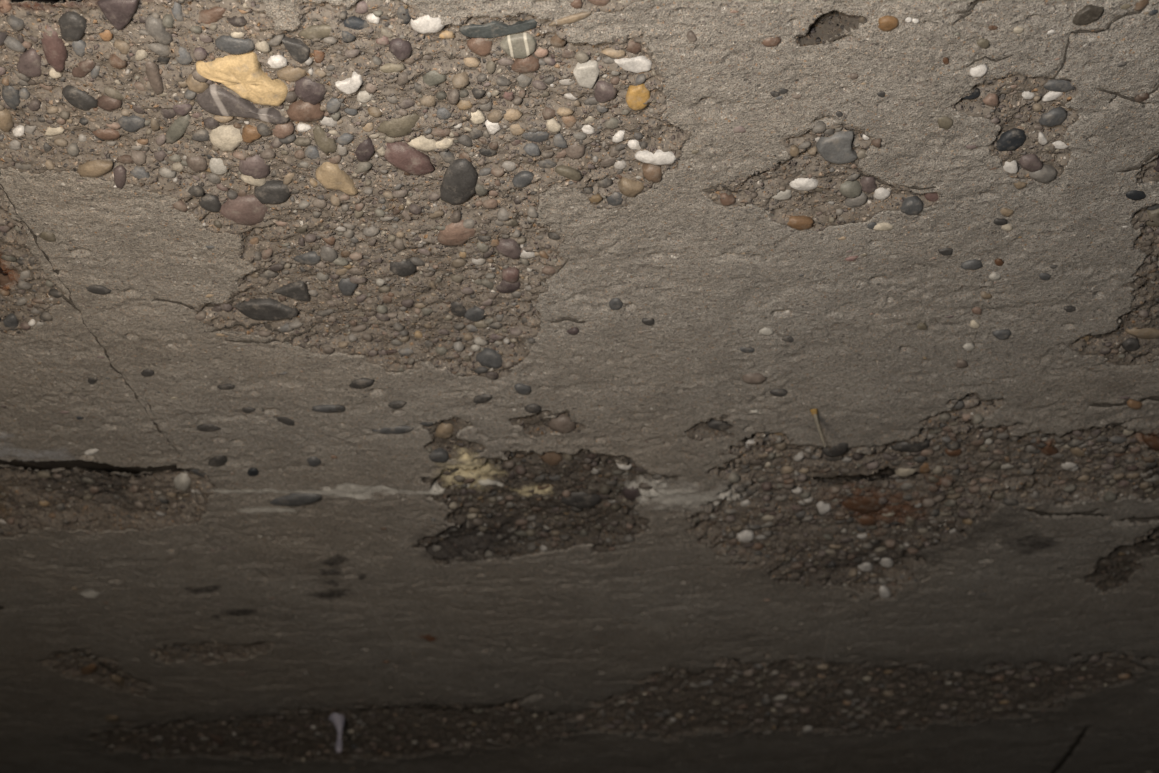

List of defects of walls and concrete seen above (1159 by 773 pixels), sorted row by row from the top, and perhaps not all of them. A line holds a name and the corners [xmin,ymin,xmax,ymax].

spalling [0,0,692,380]
spalling [705,121,940,232]
spalling [952,73,1080,189]
spalling [1136,155,1159,183]
crack [0,184,209,479]
spalling [1068,204,1159,366]
spalling [420,417,485,463]
spalling [509,404,586,437]
spalling [0,468,218,537]
spalling [685,393,1159,602]
spalling [88,700,574,766]
crack [1051,726,1088,773]